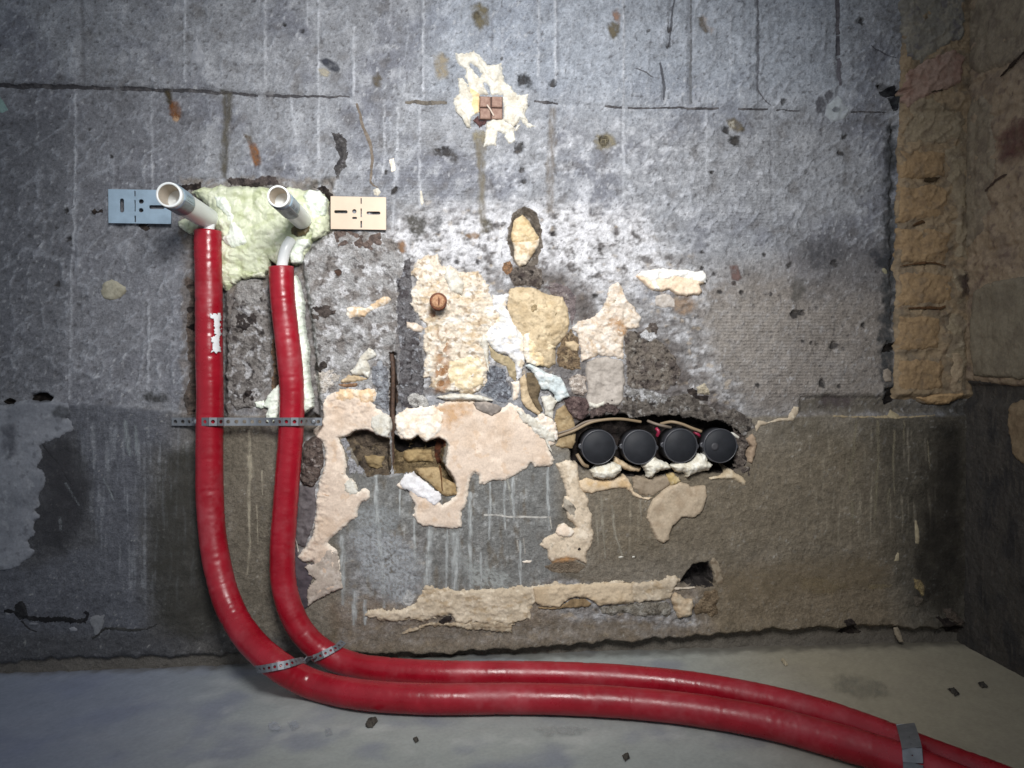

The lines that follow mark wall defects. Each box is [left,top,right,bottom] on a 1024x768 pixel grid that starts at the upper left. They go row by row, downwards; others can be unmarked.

crack [0,82,378,188]
crack [405,98,447,106]
crack [534,98,558,106]
crack [604,0,799,112]
flaking render [882,0,1024,419]
spalling [291,224,520,416]
spalling [502,206,604,409]
flaking render [636,268,707,297]
leakage [154,450,216,633]
spalling [340,430,457,496]
flaking render [646,463,746,543]
crack [4,601,157,640]